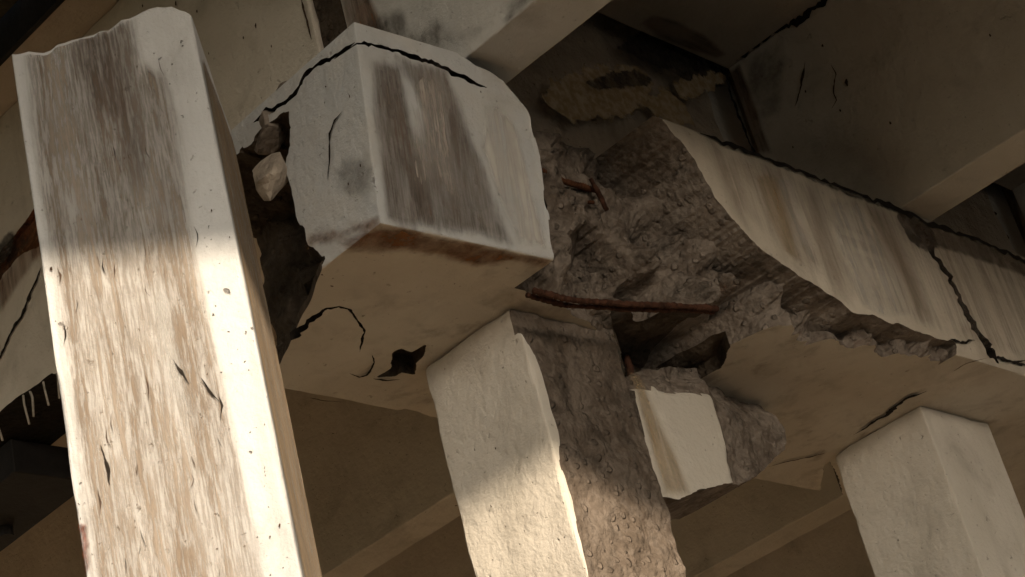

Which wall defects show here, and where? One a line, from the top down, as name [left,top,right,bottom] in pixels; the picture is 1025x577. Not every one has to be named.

crack [254,0,487,122]
crack [725,0,827,152]
peeling [252,152,289,201]
rust [0,226,41,303]
crack [0,268,41,358]
damp [203,63,322,577]
crack [290,306,400,381]
spalling [509,63,957,577]
crack [927,245,1025,371]
crack [857,391,926,433]